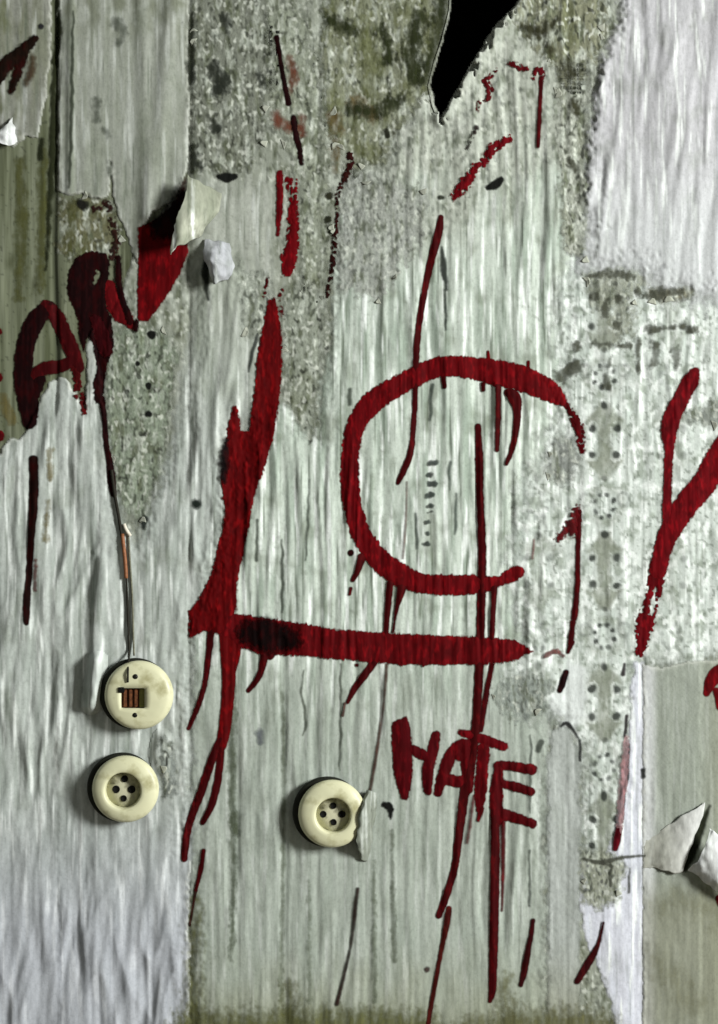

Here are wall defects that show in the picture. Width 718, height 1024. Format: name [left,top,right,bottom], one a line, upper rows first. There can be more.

peeling [187,0,447,444]
peeling [688,400,718,430]
peeling [544,438,580,485]
peeling [491,671,552,721]
peeling [578,849,625,911]